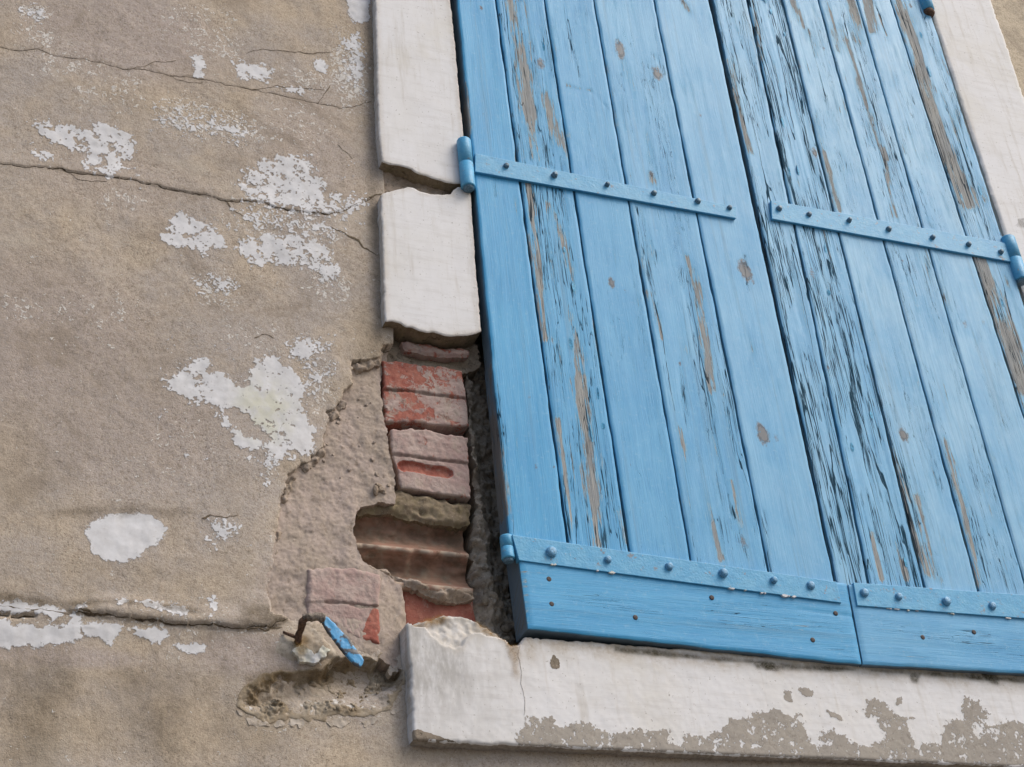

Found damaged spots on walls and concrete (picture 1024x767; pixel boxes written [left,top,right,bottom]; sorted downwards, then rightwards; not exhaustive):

crack [1,47,371,108]
peeling [189,54,206,78]
peeling [26,118,142,189]
crack [1,163,382,255]
peeling [160,152,370,287]
peeling [85,511,168,564]
flaking render [160,333,406,729]
peeling [0,597,206,655]
crack [0,606,286,632]
peeling [515,687,1024,766]